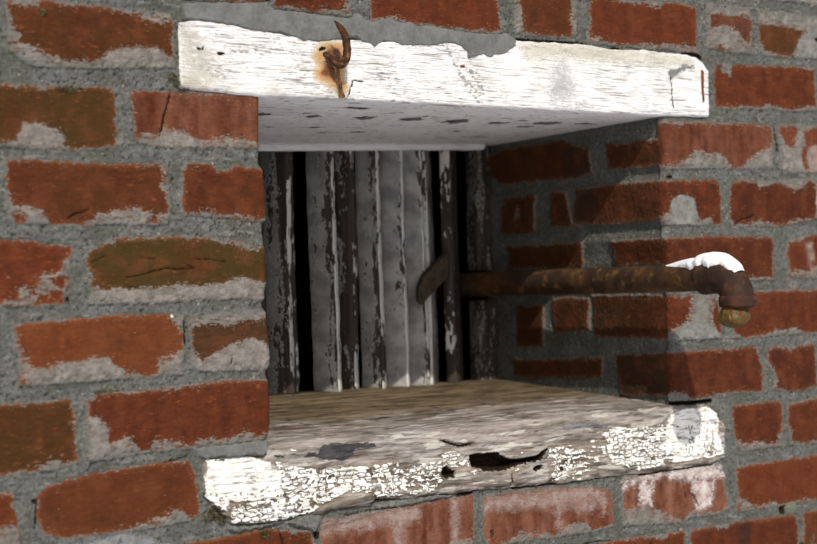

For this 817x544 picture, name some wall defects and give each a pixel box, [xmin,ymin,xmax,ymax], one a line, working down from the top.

corrosion [313,41,348,93]
crack [159,92,170,136]
efflorescence [780,146,817,173]
peeling [547,407,725,480]
peeling [204,451,481,523]